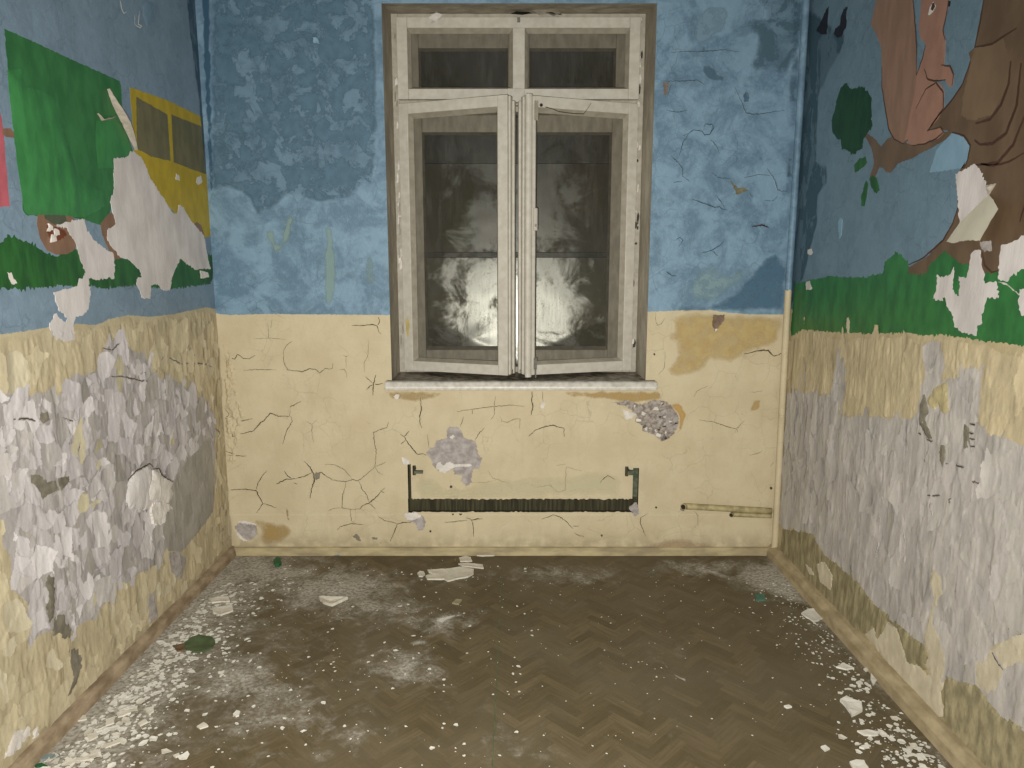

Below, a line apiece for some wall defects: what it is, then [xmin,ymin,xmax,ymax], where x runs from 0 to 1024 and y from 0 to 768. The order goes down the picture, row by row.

leakage [672,0,843,373]
crack [103,317,383,396]
crack [744,348,781,357]
peeling [0,89,257,768]
crack [215,398,429,541]
flaking render [426,427,482,488]
crack [444,517,482,537]
crack [457,391,565,441]
crack [473,464,615,537]
flaking render [615,400,679,441]
crack [693,386,774,467]
peeling [770,164,1024,768]